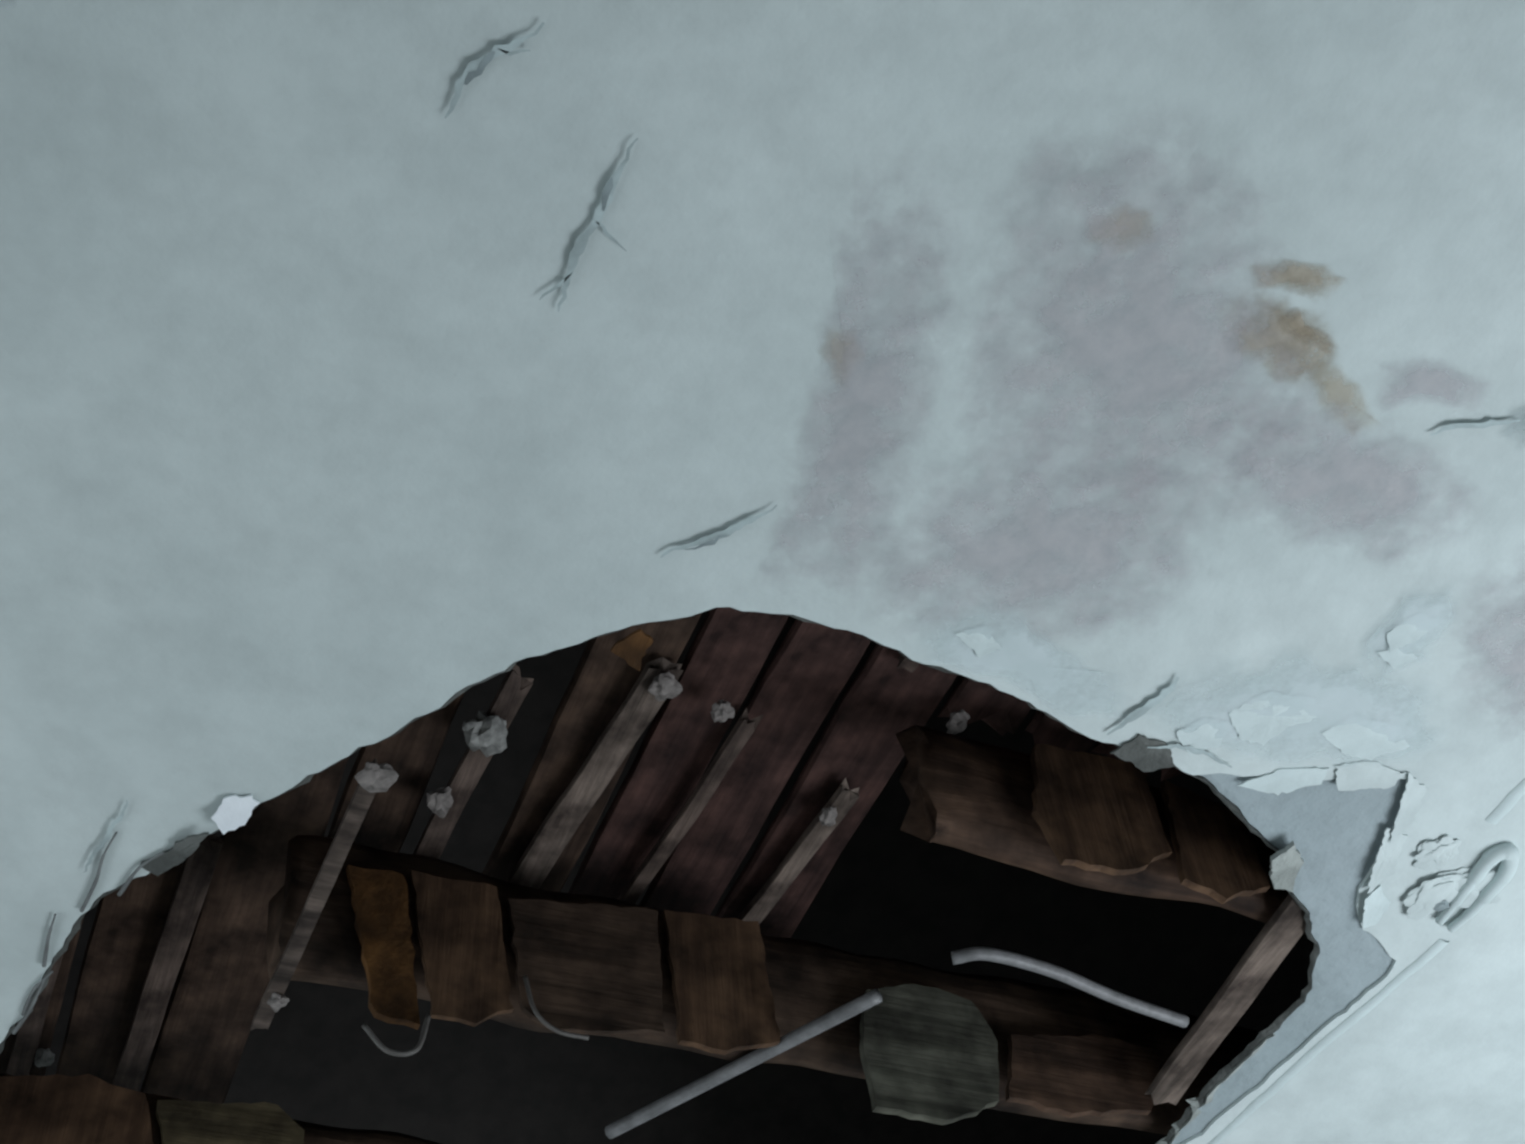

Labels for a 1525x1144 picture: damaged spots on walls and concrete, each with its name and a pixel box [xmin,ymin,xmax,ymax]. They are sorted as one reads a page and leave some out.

crack [444,22,545,119]
crack [539,138,638,312]
rust [1262,265,1324,288]
spalling [0,607,1427,1144]